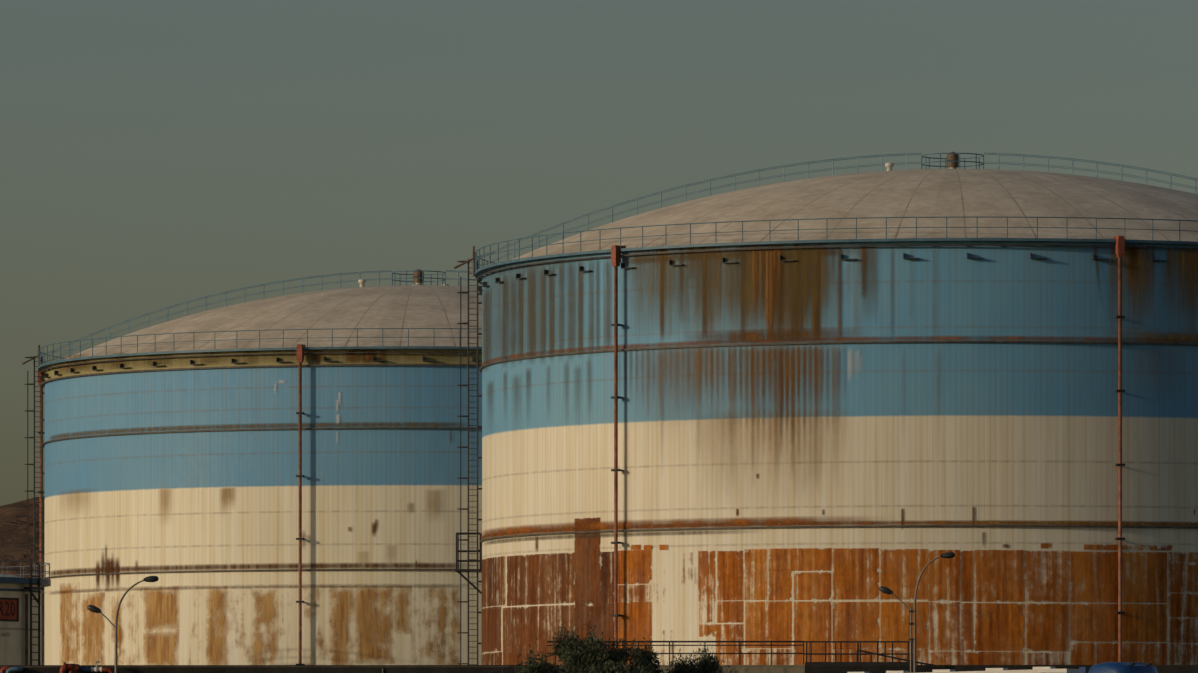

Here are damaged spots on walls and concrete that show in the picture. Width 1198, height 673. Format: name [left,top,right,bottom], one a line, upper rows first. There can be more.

corrosion [481,248,878,412]
corrosion [481,507,1198,665]